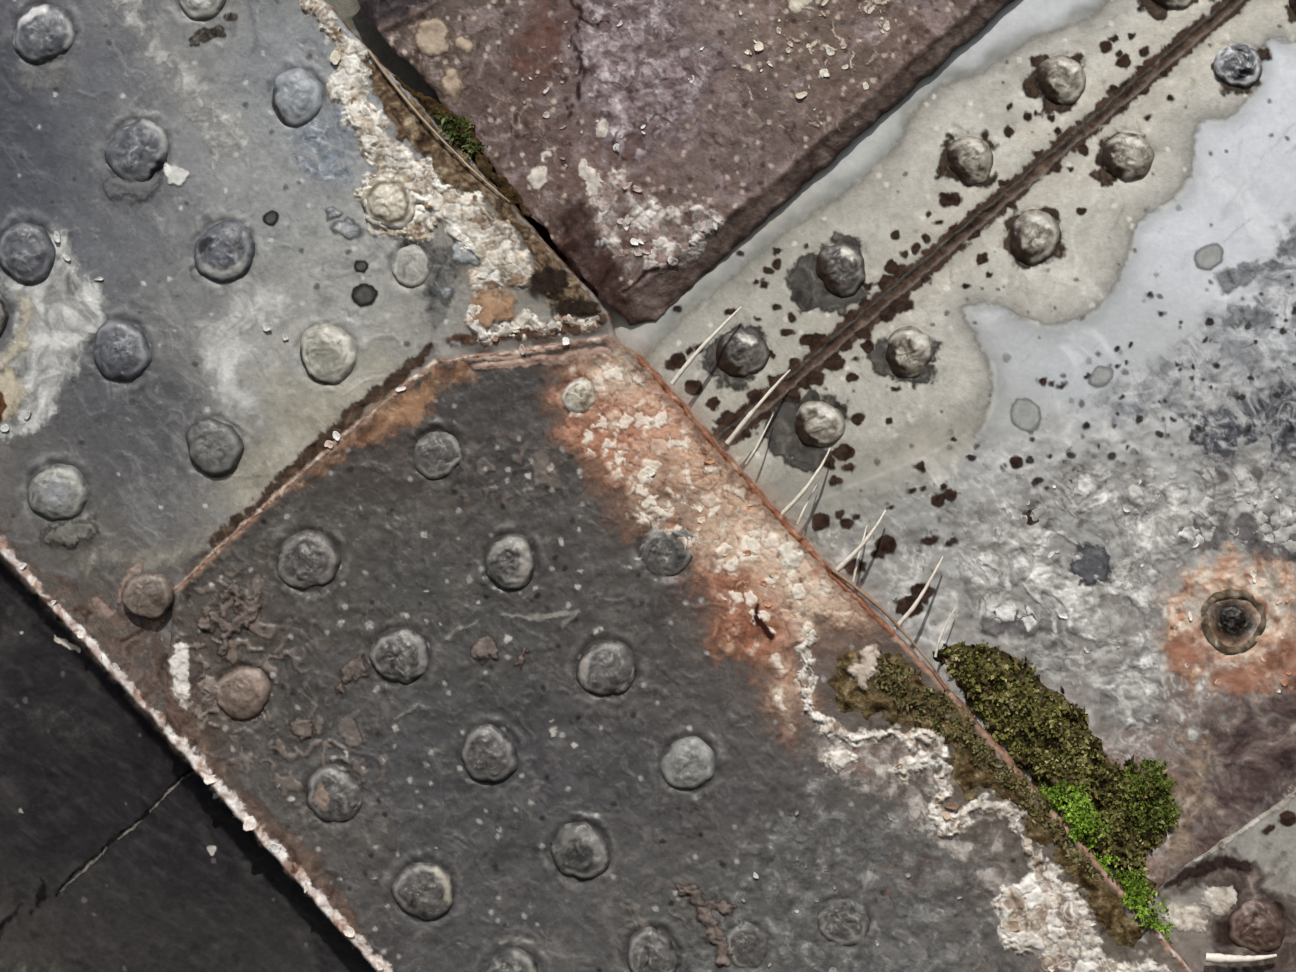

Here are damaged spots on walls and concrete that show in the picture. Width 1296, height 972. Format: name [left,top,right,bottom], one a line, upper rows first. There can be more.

rust [1211,63,1261,96]
rust [1257,47,1272,60]
rust [1285,4,1296,22]
rust [291,360,472,489]
rust [544,0,1248,748]
peeling [0,537,393,972]
rust [1153,542,1296,972]
crack [0,769,195,929]